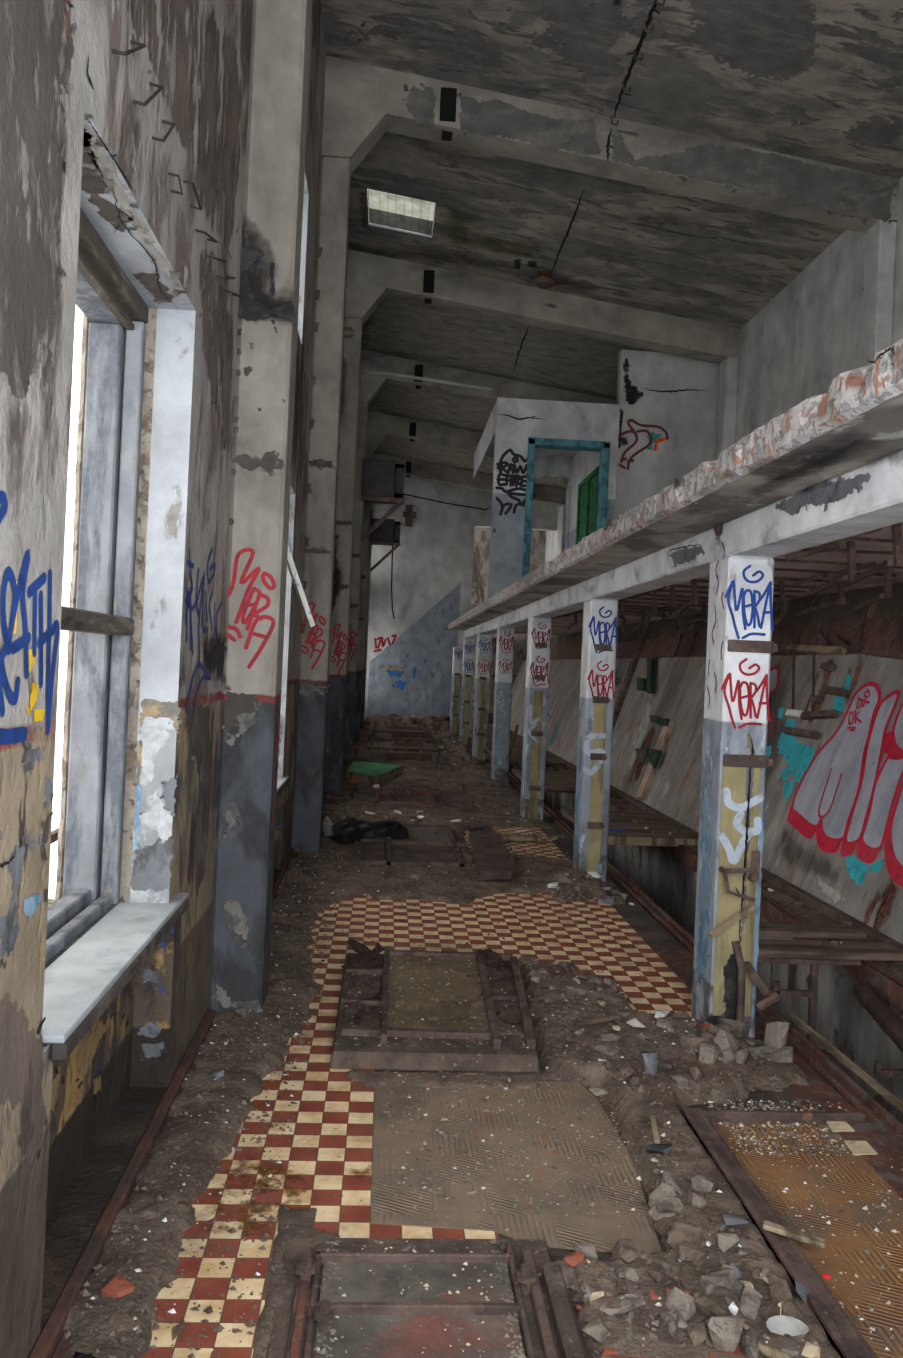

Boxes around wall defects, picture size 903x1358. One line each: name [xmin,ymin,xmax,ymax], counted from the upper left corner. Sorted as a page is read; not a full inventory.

crack [606,0,660,161]
peeling [81,0,285,476]
water stain [237,223,296,335]
water stain [447,209,538,269]
crack [550,187,585,277]
crack [512,325,530,375]
peeling [775,473,871,515]
peeling [668,522,723,566]
peeling [130,691,261,898]
flaking render [140,966,163,984]
peeling [0,993,165,1167]